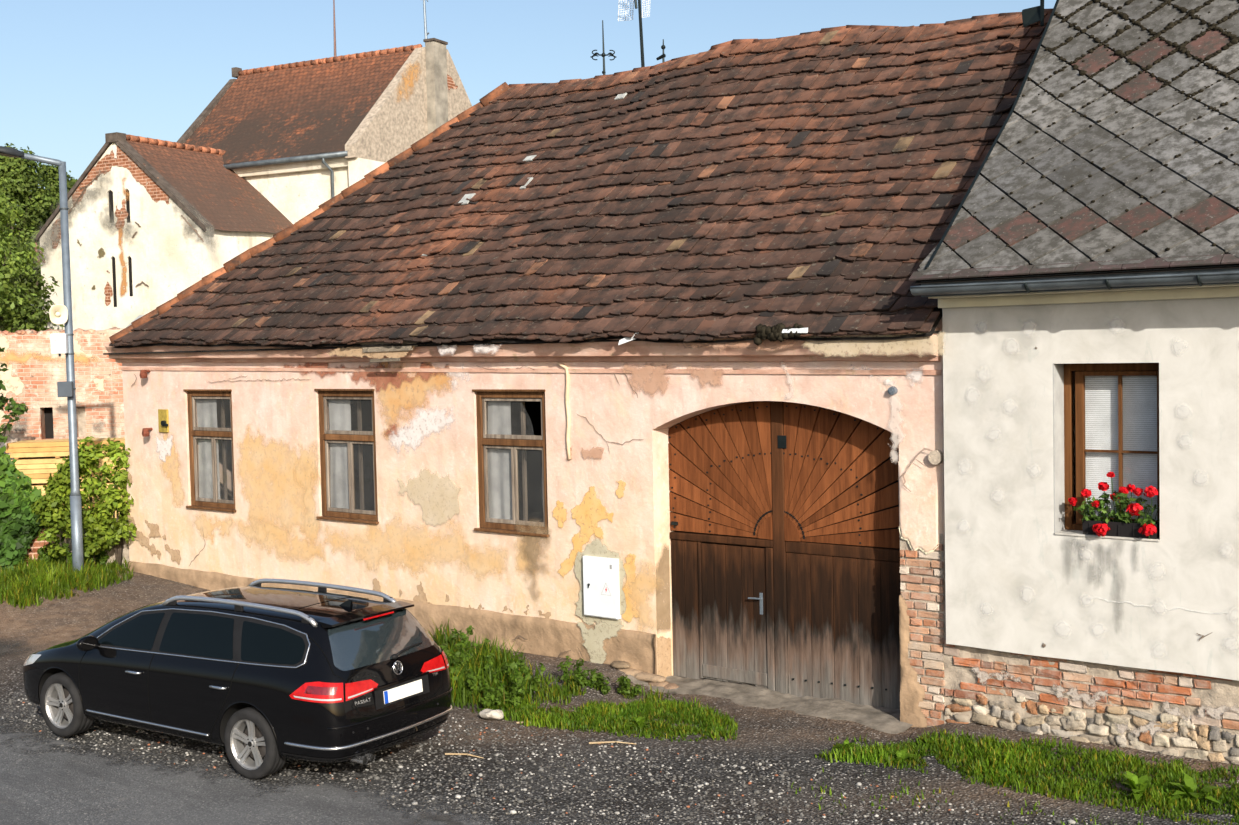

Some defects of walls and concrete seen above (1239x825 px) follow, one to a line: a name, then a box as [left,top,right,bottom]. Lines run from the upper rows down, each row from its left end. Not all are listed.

flaking render [72,145,170,205]
flaking render [115,192,128,229]
crack [577,414,644,453]
peeling [616,480,626,498]
flaking render [128,516,181,564]
peeling [553,486,613,578]
peeling [622,554,640,622]
flaking render [899,531,1239,730]